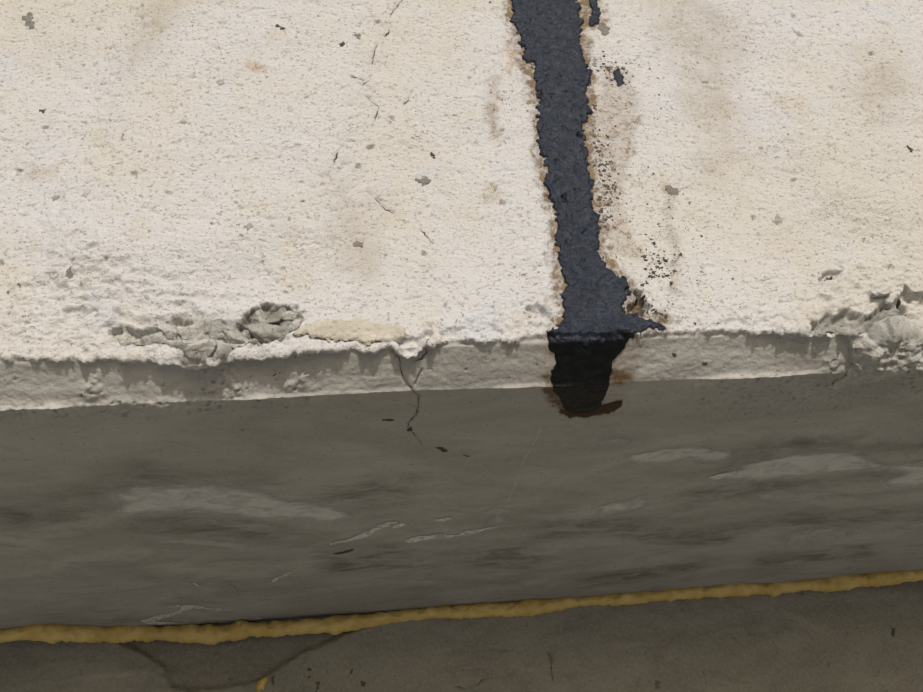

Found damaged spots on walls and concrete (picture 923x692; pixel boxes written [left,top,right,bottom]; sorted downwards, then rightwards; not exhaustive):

crack [353,0,403,120]
spalling [107,301,410,363]
spalling [811,285,907,337]
crack [394,339,429,441]